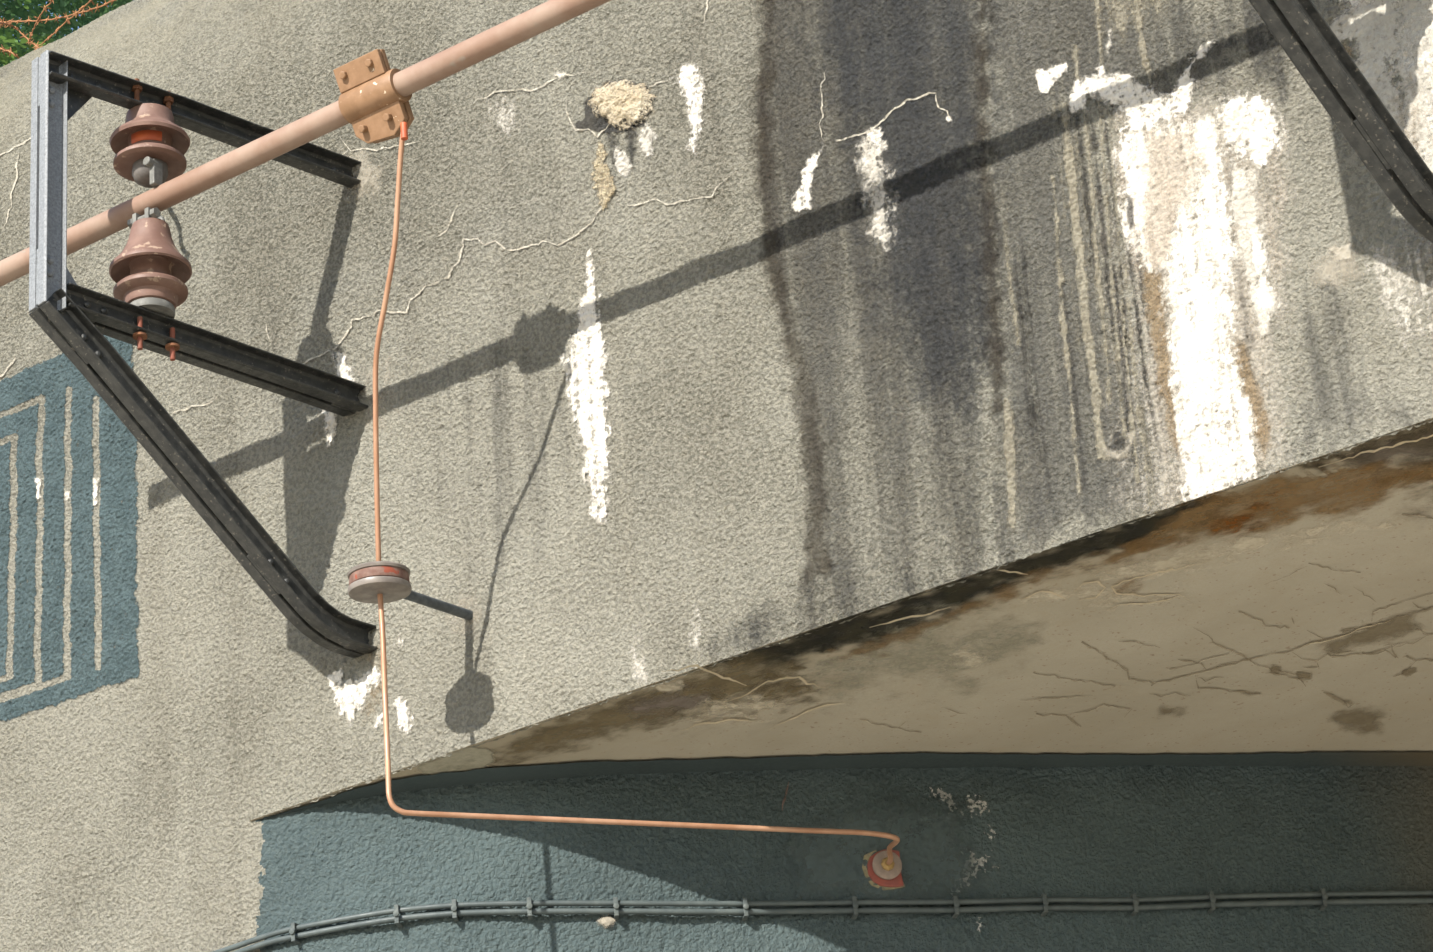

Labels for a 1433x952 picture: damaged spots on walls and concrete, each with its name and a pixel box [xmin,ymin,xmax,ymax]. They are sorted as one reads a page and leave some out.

efflorescence [679,64,705,154]
crack [792,72,952,251]
leakage [760,0,1021,471]
leakage [1036,0,1291,507]
leakage [1330,0,1433,173]
leakage [1368,237,1433,347]
efflorescence [560,250,611,524]
leakage [1003,398,1036,528]
leakage [1300,420,1433,468]
leakage [488,647,841,767]
crack [1023,563,1433,727]
leakage [1327,606,1433,653]